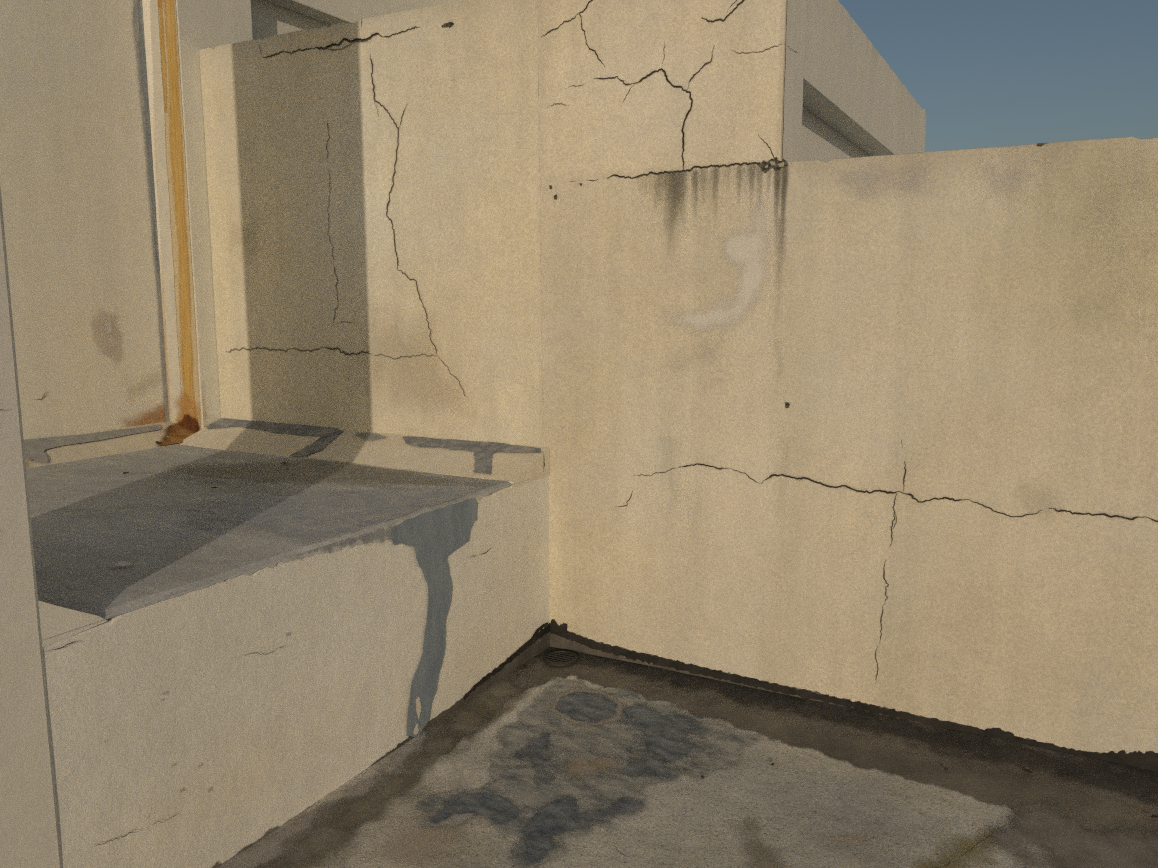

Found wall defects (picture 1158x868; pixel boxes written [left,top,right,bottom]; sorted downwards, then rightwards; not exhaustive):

corrosion [134,0,201,446]
crack [226,19,467,397]
crack [538,0,799,182]
water stain [775,166,788,206]
crack [617,444,1158,679]